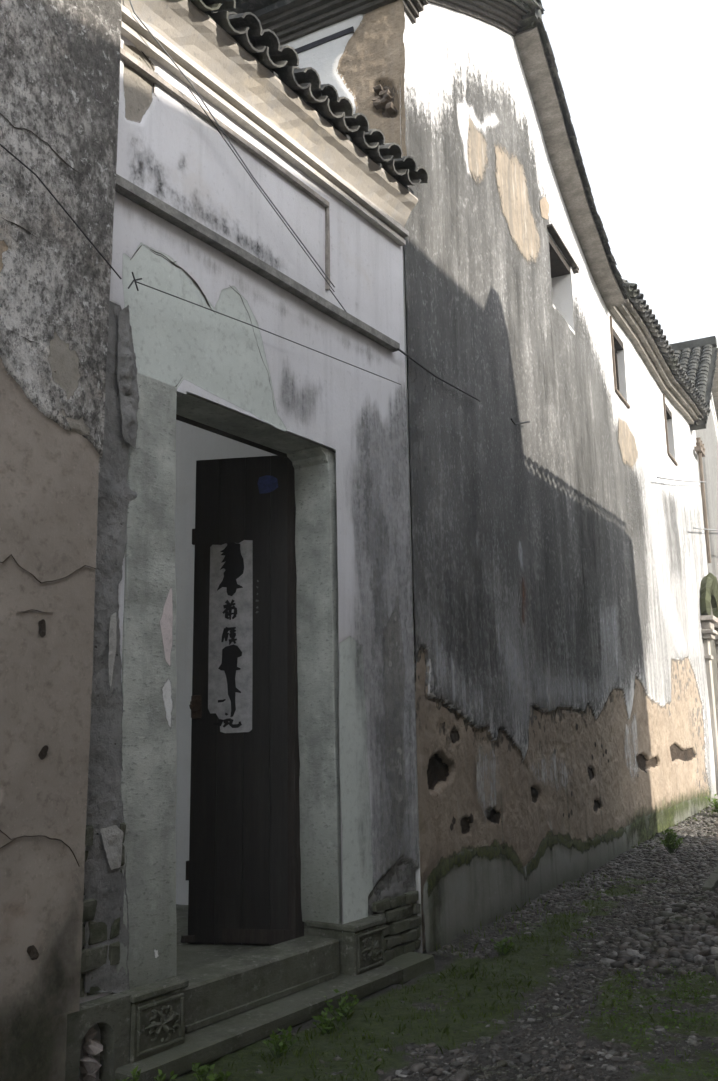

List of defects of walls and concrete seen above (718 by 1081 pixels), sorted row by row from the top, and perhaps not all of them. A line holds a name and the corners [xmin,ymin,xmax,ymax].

peeling [123,44,159,123]
spalling [336,0,407,156]
water stain [195,198,277,267]
spalling [457,102,550,263]
water stain [354,50,718,914]
spalling [618,417,639,469]
crack [0,554,95,584]
spalling [0,240,286,1081]
crack [0,830,80,867]
spalling [339,636,710,963]